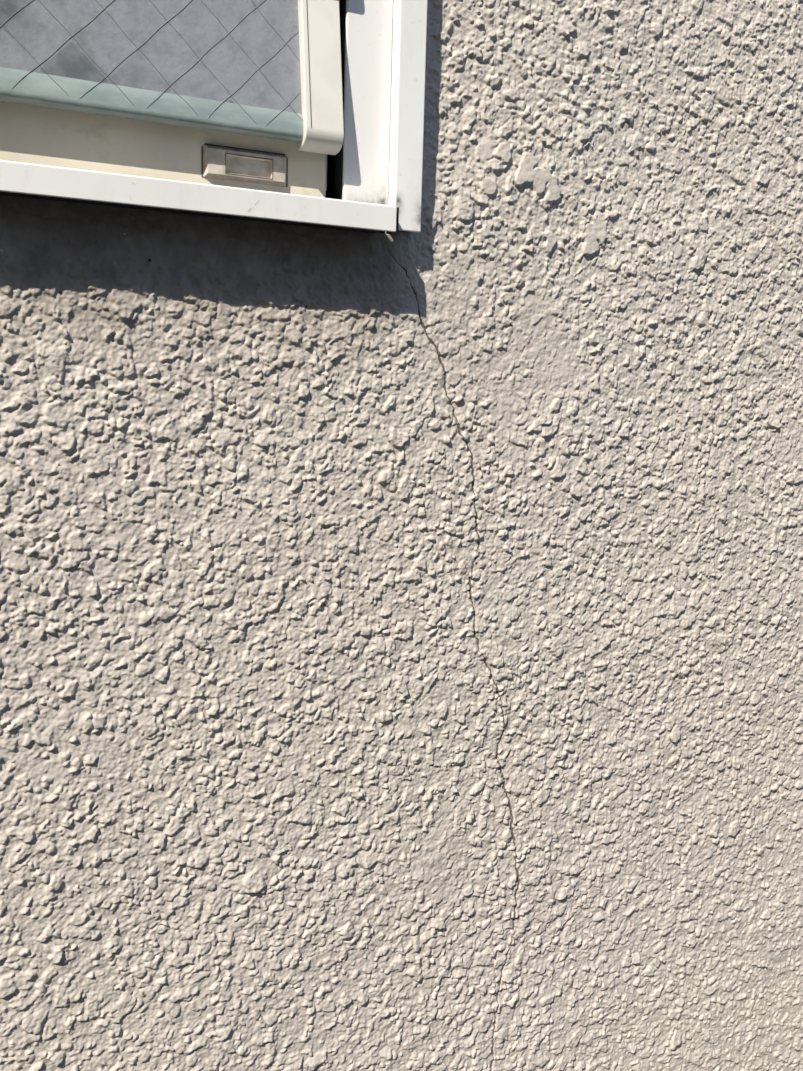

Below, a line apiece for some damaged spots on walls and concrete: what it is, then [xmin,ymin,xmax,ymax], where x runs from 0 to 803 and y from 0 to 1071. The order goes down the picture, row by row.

crack [380,233,528,1071]